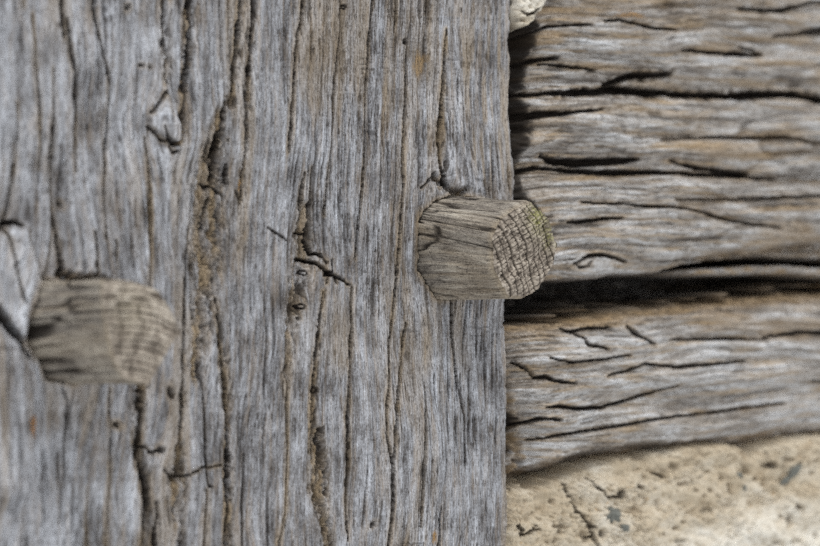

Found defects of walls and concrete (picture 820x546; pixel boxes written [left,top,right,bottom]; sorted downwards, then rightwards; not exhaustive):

crack [436,28,448,181]
crack [508,0,820,124]
crack [267,0,408,546]
crack [502,135,820,453]
crack [418,392,443,546]
crack [561,477,626,546]